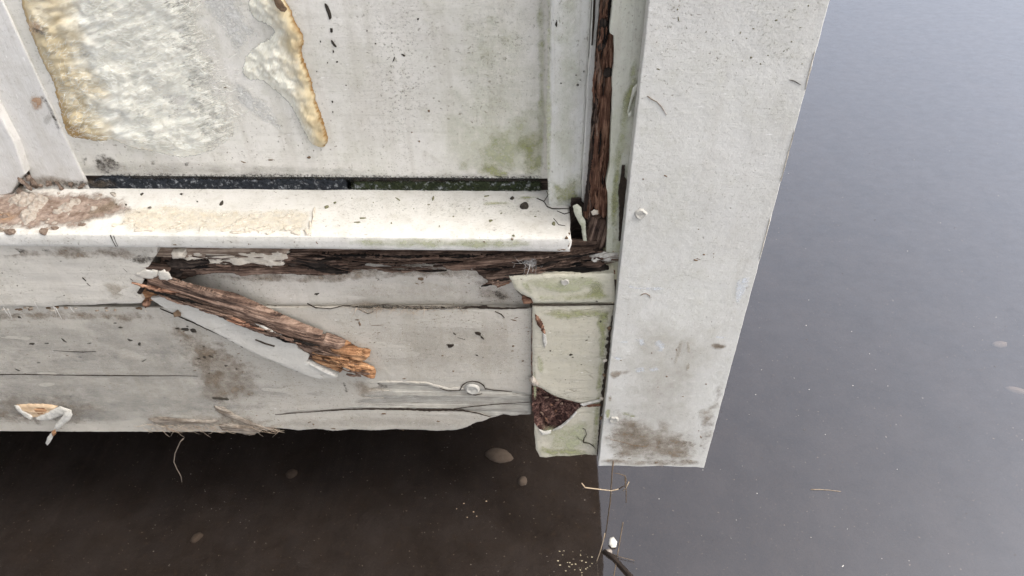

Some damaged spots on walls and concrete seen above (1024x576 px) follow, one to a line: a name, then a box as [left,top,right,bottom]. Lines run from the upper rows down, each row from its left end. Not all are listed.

peeling [182,242,295,268]
peeling [589,251,619,262]
peeling [124,269,172,281]
peeling [497,295,551,352]
peeling [319,333,346,349]
peeling [14,396,73,446]